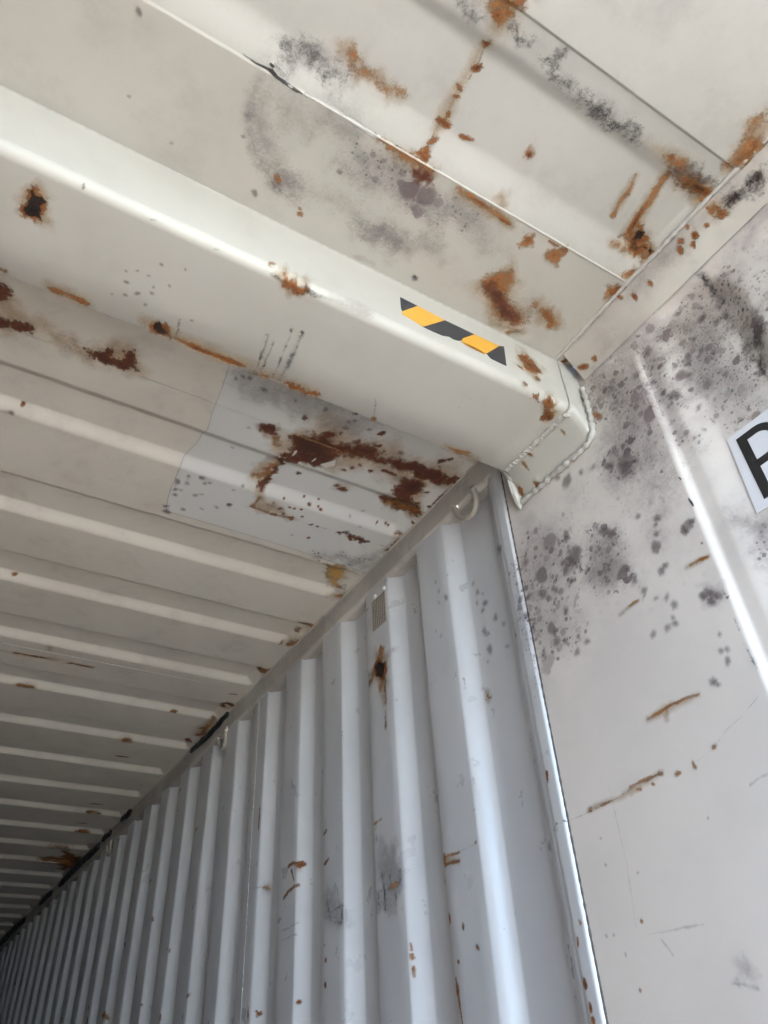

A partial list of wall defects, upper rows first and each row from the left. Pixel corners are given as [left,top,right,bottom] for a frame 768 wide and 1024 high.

water stain [282,42,337,82]
rust [19,185,47,223]
water stain [377,157,419,211]
rust [604,154,715,301]
rust [268,261,308,295]
rust [481,269,557,334]
rust [83,347,140,372]
rust [149,321,245,367]
rust [517,355,555,421]
water stain [589,265,768,480]
rust [251,423,469,539]
water stain [509,528,645,661]